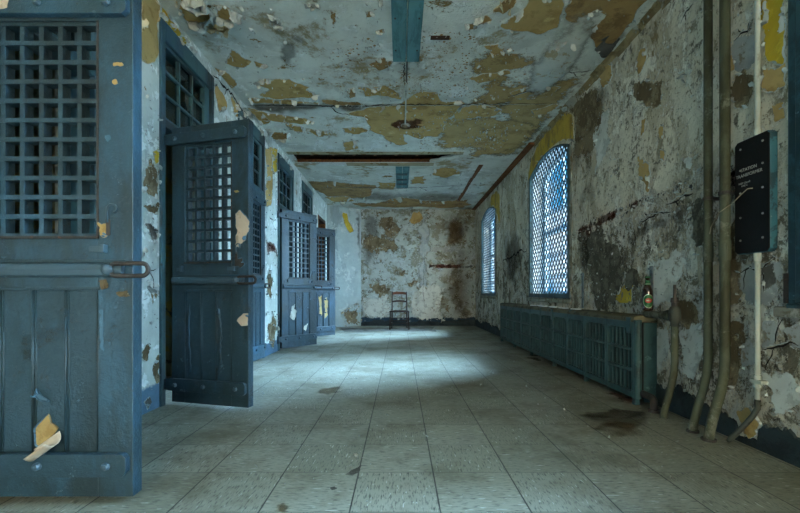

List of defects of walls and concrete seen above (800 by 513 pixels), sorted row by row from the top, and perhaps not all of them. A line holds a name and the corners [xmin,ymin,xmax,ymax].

crack [214,63,604,115]
peeling [628,47,666,110]
peeling [731,0,788,109]
peeling [142,0,654,349]
water stain [448,222,464,243]
rust [577,182,695,236]
water stain [692,198,703,248]
peeling [142,343,160,410]
water stain [450,273,463,312]
water stain [580,225,639,311]
peeling [727,220,800,416]
crack [762,320,798,373]